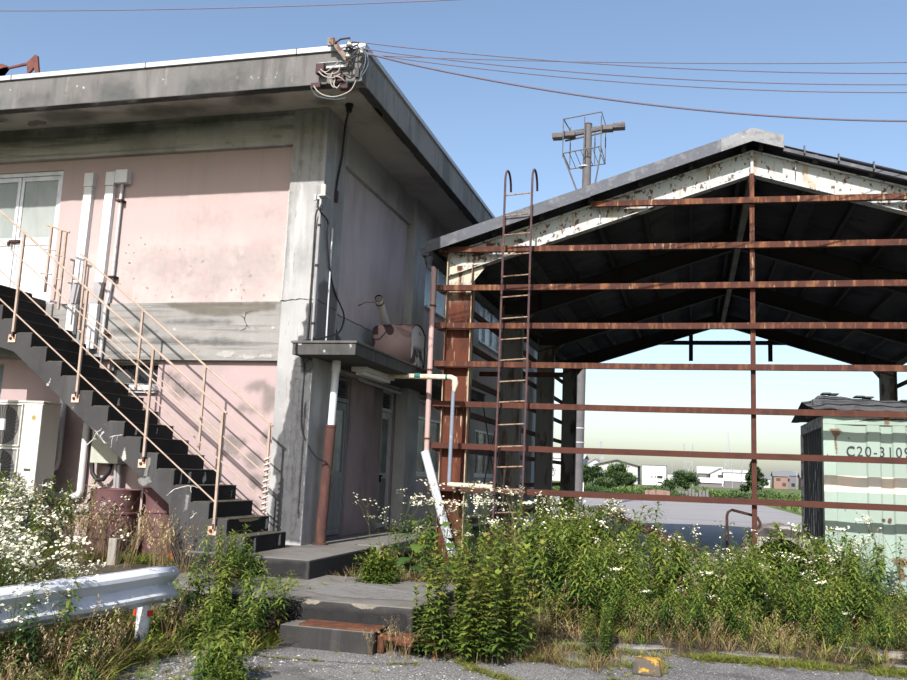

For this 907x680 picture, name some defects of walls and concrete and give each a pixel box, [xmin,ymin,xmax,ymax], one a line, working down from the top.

damp [298,303,314,345]
damp [265,357,313,545]
damp [254,562,305,577]